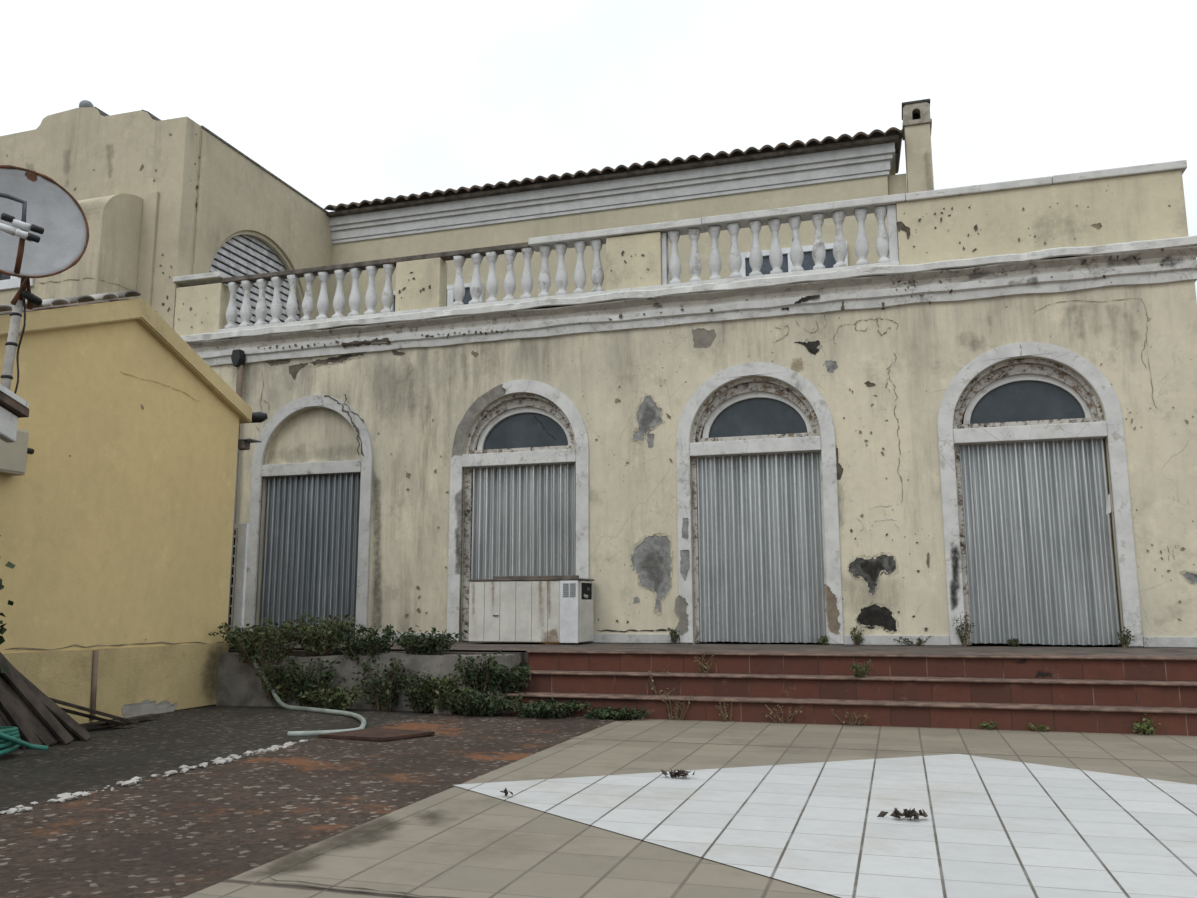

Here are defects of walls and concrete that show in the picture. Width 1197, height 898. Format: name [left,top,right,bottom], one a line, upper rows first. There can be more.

flaking render [692,328,716,348]
peeling [631,385,671,448]
crack [772,315,903,532]
peeling [629,518,689,635]
flaking render [824,552,915,634]
peeling [1146,544,1197,584]